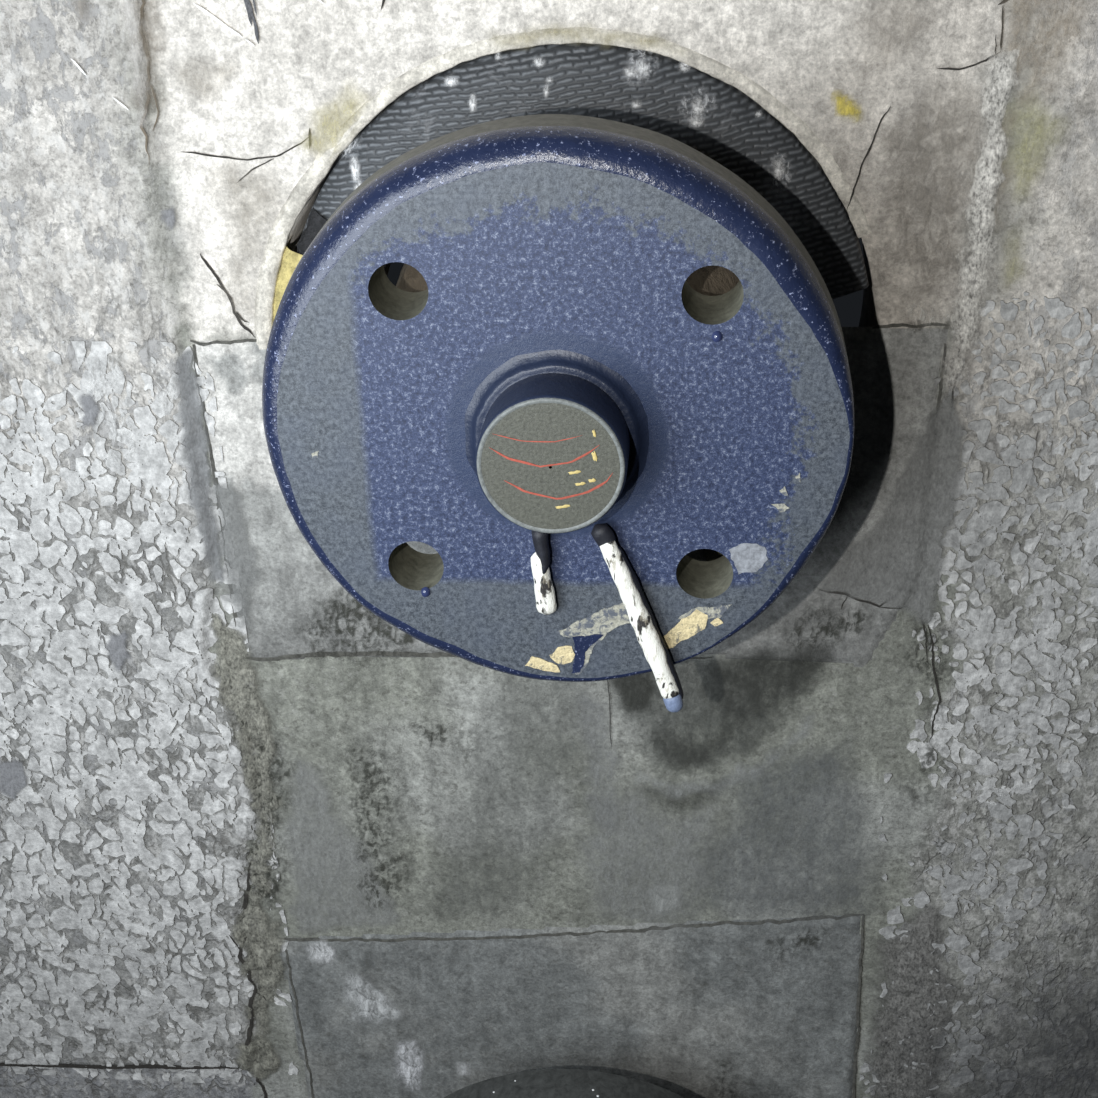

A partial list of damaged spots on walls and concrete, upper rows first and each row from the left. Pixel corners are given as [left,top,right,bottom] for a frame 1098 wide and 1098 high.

crack [937,0,1008,82]
crack [185,128,311,183]
crack [846,106,891,212]
crack [200,254,255,338]
crack [951,344,960,403]
peeling [525,603,630,675]
peeling [662,604,732,649]
crack [819,589,941,742]
leakage [617,661,802,763]